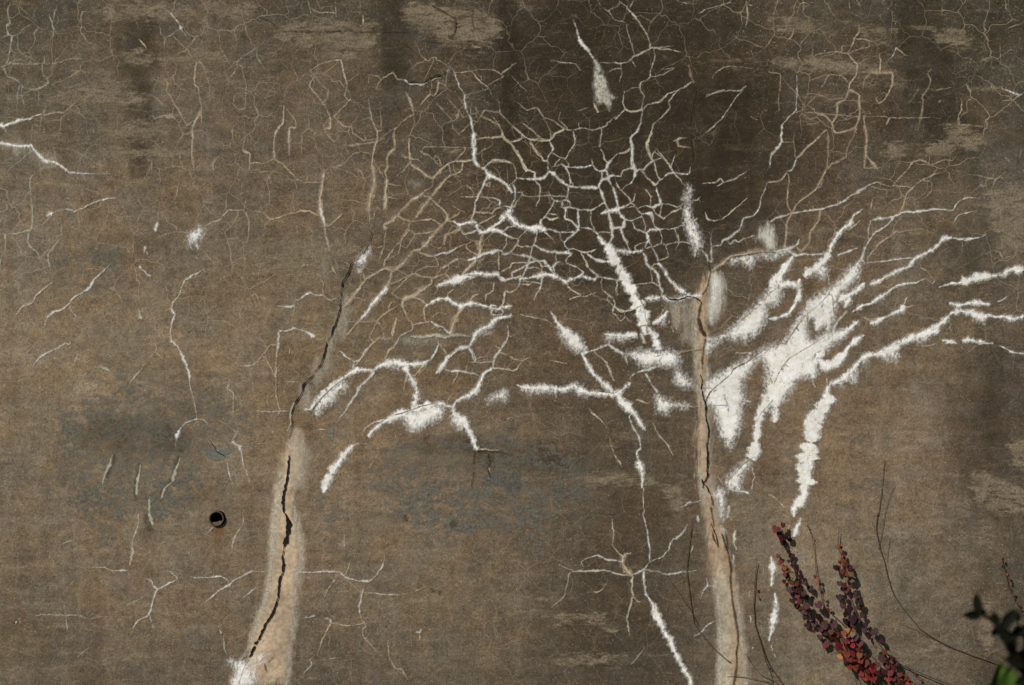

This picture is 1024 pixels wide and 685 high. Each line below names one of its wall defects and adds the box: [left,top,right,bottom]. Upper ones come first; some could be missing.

efflorescence [575,25,615,113]
crack [184,111,340,239]
efflorescence [682,189,703,256]
efflorescence [521,314,587,353]
crack [244,2,1024,685]
efflorescence [597,223,865,537]
efflorescence [949,298,1005,308]
efflorescence [933,338,1024,354]
efflorescence [941,265,1024,287]
crack [227,385,248,475]
crack [202,456,292,670]
efflorescence [769,557,778,655]